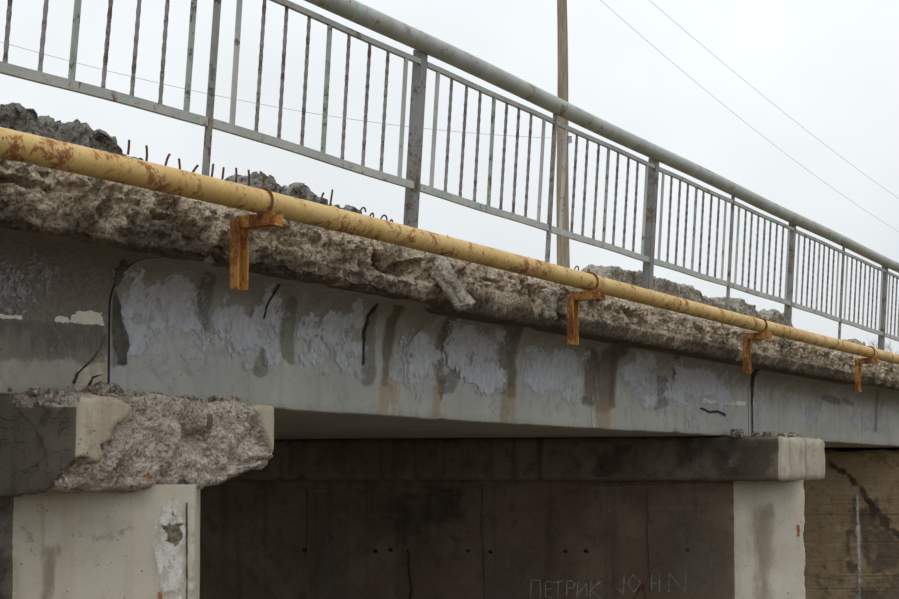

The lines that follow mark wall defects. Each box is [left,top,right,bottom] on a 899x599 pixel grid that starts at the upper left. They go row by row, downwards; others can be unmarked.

peeling [113,263,367,380]
crack [263,284,281,319]
damp [384,305,403,385]
damp [437,317,455,397]
damp [508,327,522,397]
damp [583,344,627,412]
spalling [161,512,184,546]